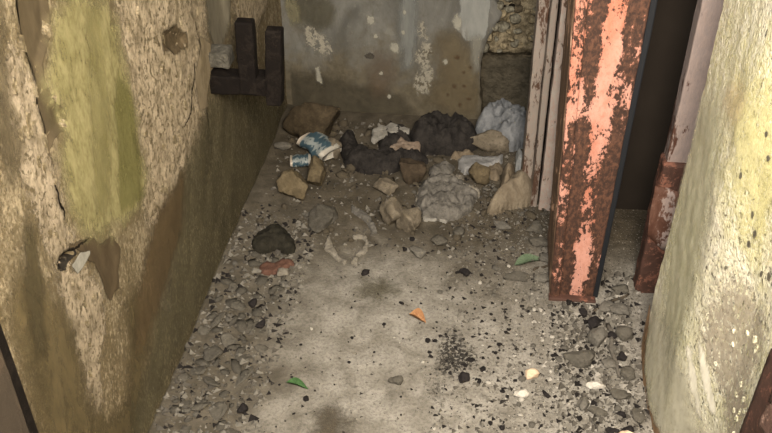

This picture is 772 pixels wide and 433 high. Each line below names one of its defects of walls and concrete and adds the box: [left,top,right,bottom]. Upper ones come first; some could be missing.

flaking render [4,0,121,414]
leakage [87,8,142,215]
leakage [10,99,285,433]
spalling [453,0,537,68]